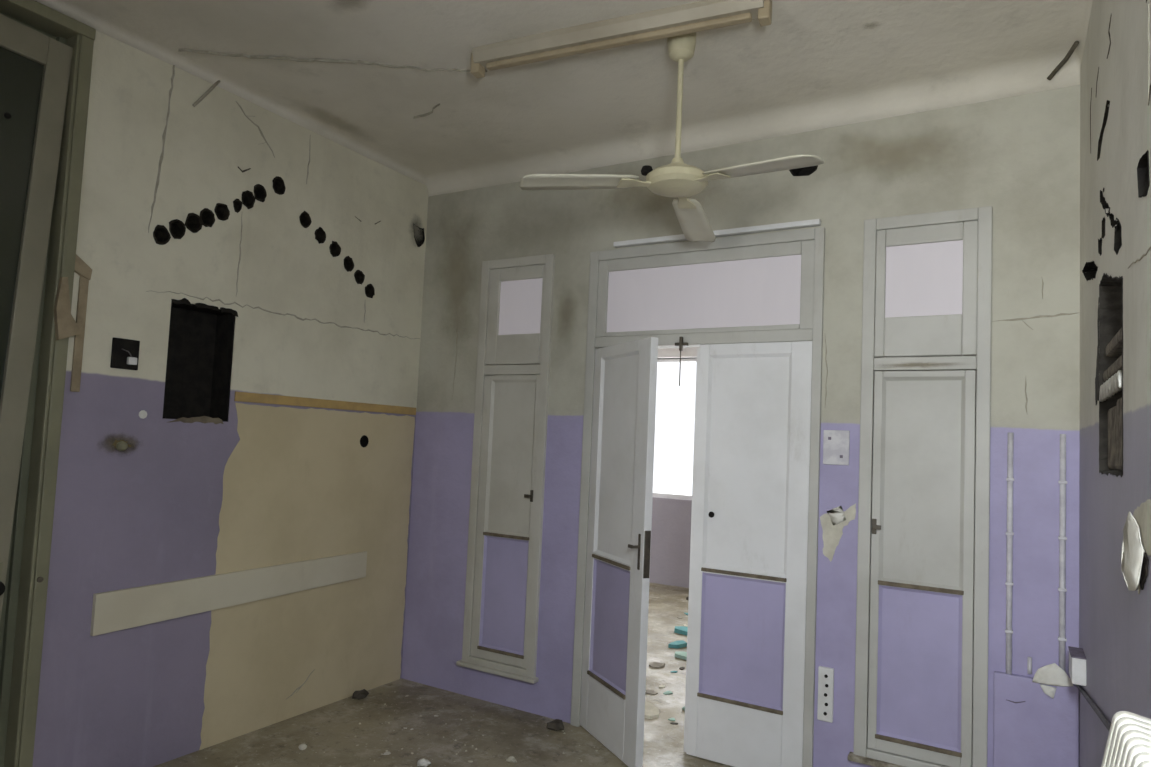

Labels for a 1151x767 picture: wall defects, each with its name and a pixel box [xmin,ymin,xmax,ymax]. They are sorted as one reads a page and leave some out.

crack [148,48,487,233]
spalling [1097,100,1110,161]
spalling [1137,150,1150,198]
spalling [1082,188,1122,281]
crack [1128,246,1151,268]
peeling [820,504,856,562]
peeling [1121,499,1151,594]
peeling [1032,663,1073,699]